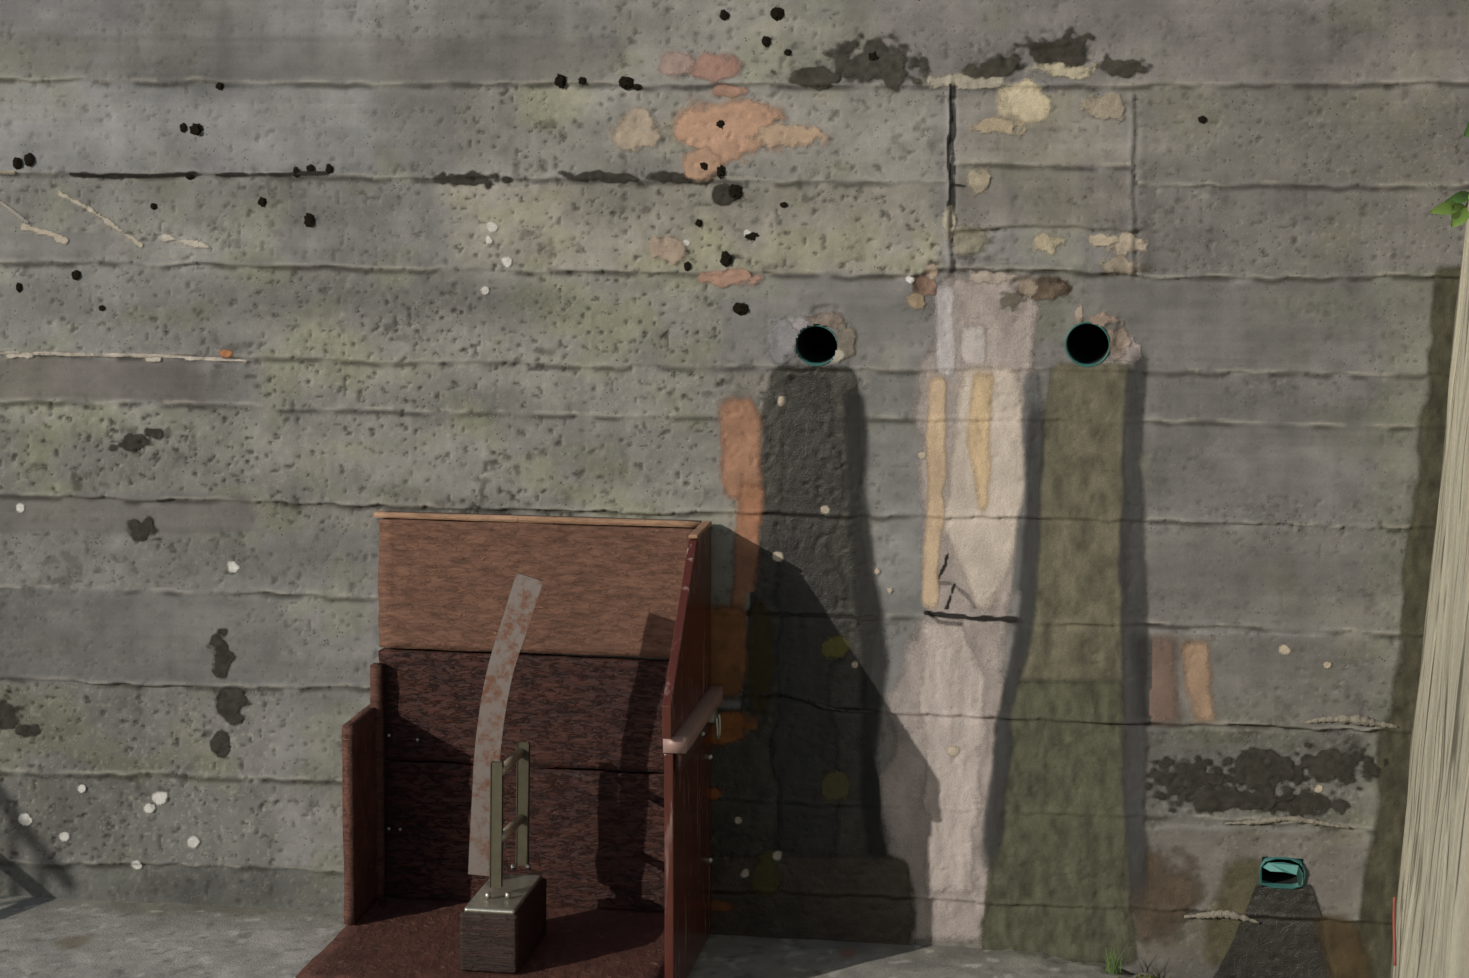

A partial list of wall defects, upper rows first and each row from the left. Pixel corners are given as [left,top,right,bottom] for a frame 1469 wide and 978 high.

crack [946,83,963,247]
peeling [920,62,1125,135]
rust [711,398,764,746]
damp [711,275,1387,978]